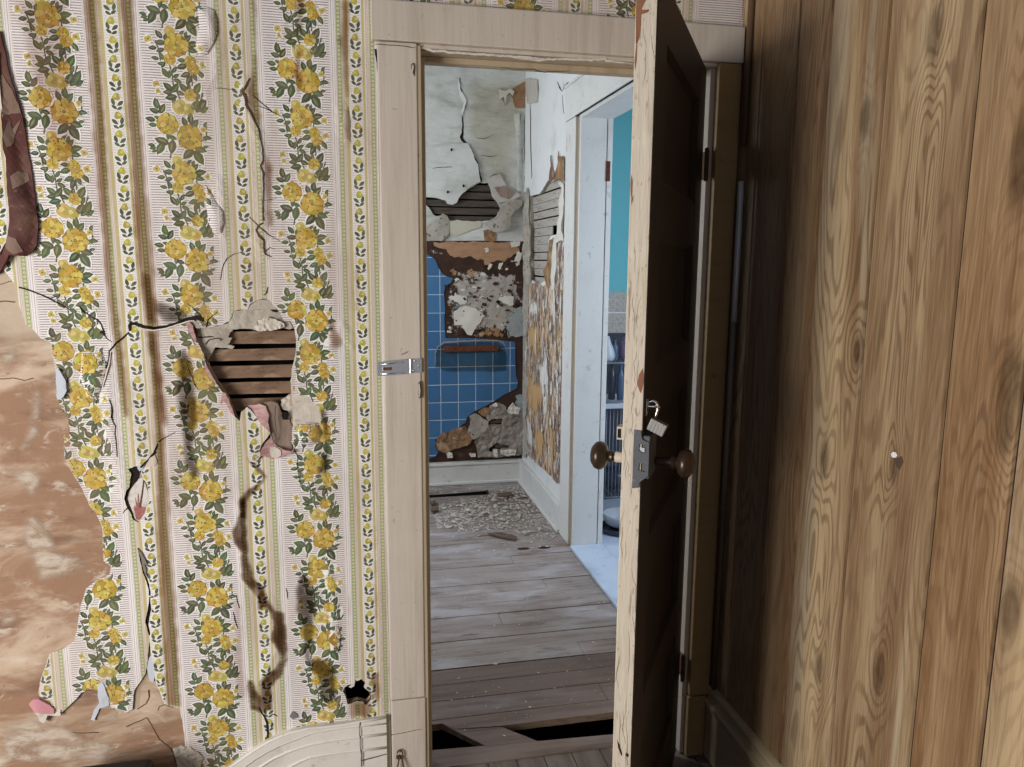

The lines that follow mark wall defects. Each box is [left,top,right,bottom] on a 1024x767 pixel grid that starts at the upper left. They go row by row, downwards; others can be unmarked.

crack [218,78,280,279]
crack [458,79,497,182]
flaking render [0,32,203,767]
crack [19,287,217,518]
spalling [186,299,322,427]
spalling [426,143,565,484]
crack [137,548,151,635]
damp [233,462,286,711]
spalling [345,680,370,704]